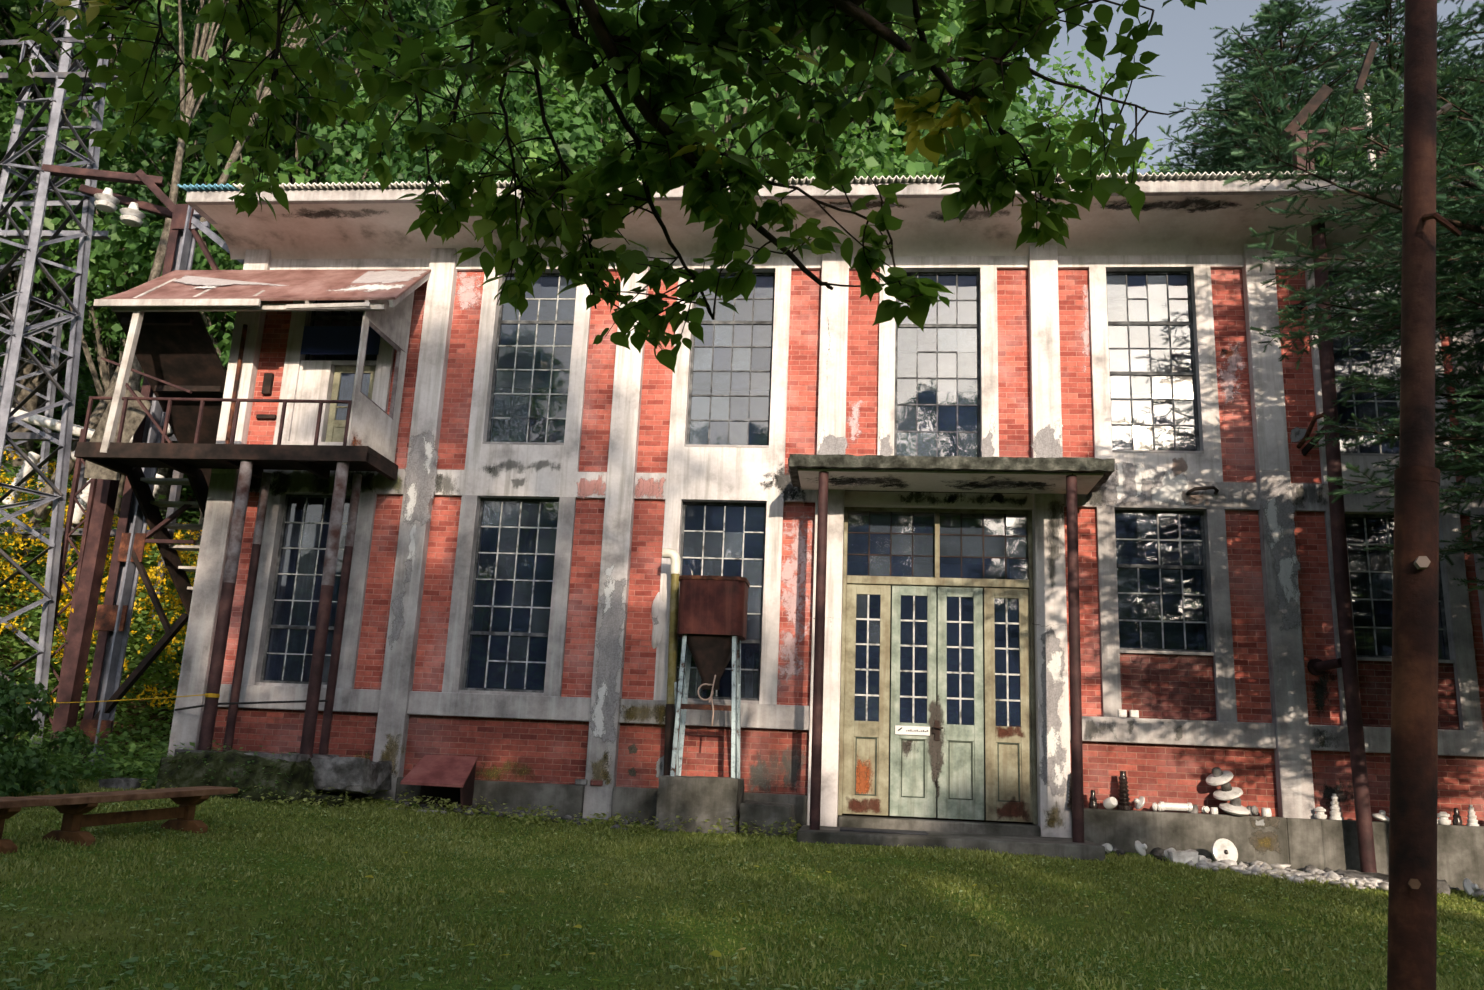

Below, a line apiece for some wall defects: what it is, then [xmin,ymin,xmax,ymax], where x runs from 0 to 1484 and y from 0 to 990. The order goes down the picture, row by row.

peeling [403,431,440,525]
damp [1086,481,1107,505]
peeling [1092,458,1164,508]
peeling [388,559,412,648]
damp [760,464,1064,684]
peeling [1259,480,1302,631]
peeling [590,563,638,776]
peeling [1039,628,1067,797]
rust [847,758,880,813]